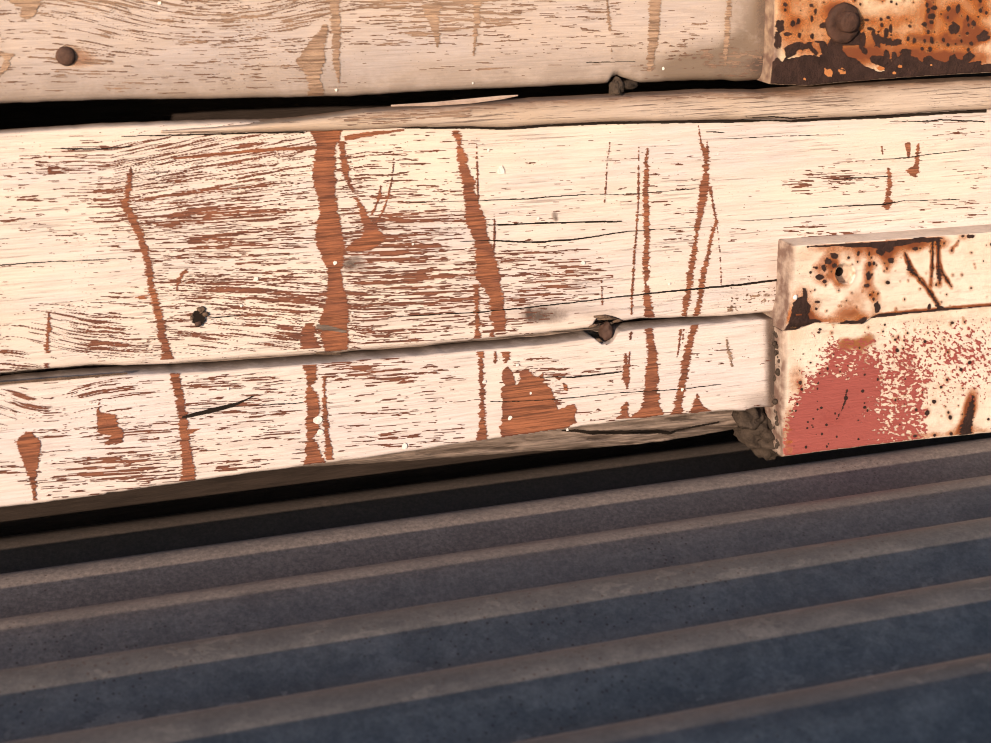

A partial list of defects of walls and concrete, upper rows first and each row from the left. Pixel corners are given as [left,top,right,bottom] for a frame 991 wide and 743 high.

corrosion [770,0,991,85]
peeling [646,82,934,99]
peeling [923,116,984,141]
peeling [782,142,922,225]
peeling [910,167,989,228]
peeling [783,221,871,237]
peeling [0,103,776,501]
corrosion [784,234,991,448]
crack [182,396,304,418]
crack [490,371,721,402]
crack [562,421,719,435]
peeling [783,317,991,455]